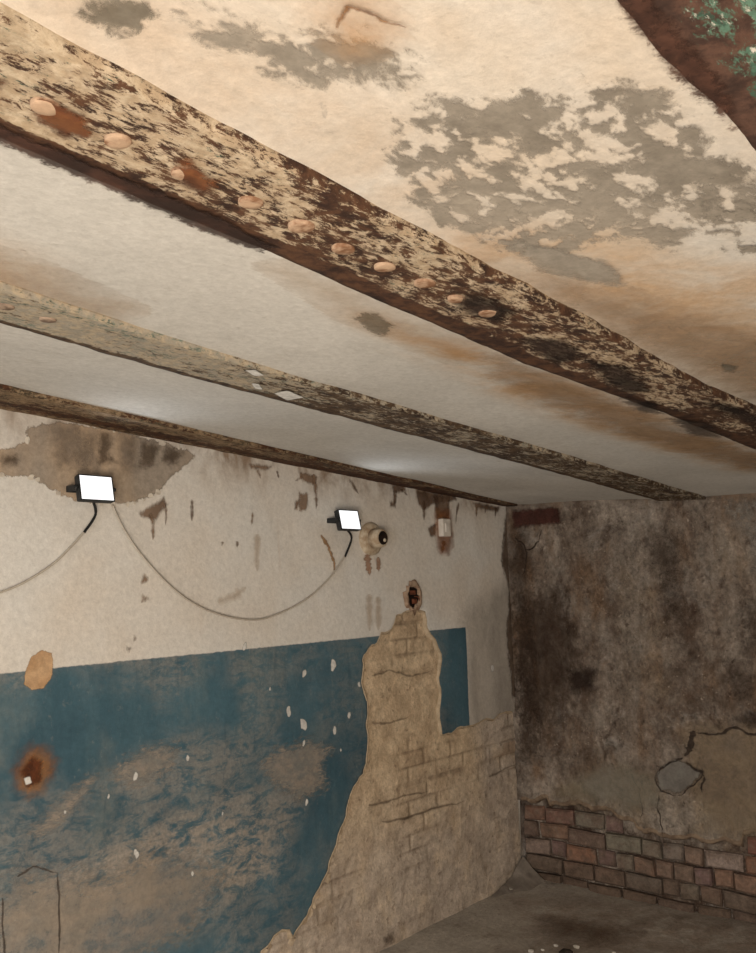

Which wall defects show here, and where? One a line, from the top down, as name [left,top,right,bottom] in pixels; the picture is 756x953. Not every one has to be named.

peeling [192,21,420,90]
peeling [386,79,756,287]
damp [456,295,515,323]
damp [624,316,756,391]
damp [510,338,756,468]
peeling [0,422,195,507]
flaking render [24,650,53,690]
corrosion [19,750,51,790]
flaking render [261,587,756,953]
crack [641,726,756,836]